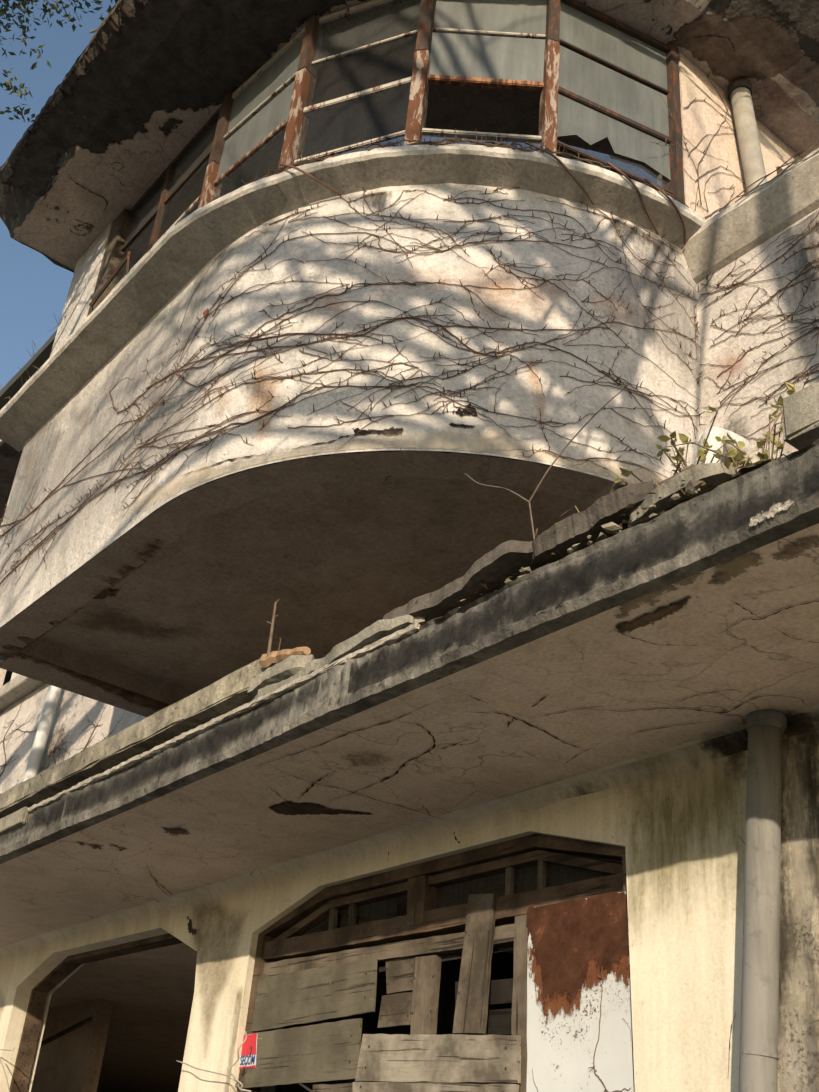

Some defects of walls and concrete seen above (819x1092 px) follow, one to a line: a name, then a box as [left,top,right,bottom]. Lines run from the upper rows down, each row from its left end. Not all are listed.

flaking render [2,0,366,236]
peeling [136,403,544,509]
peeling [749,500,794,526]
damp [338,467,819,701]
peeling [615,535,819,635]
crack [719,600,819,643]
damp [0,688,316,840]
crack [261,703,467,843]
crack [466,690,805,765]
damp [711,729,748,764]
corrosion [526,891,630,1044]
damp [778,712,819,1092]